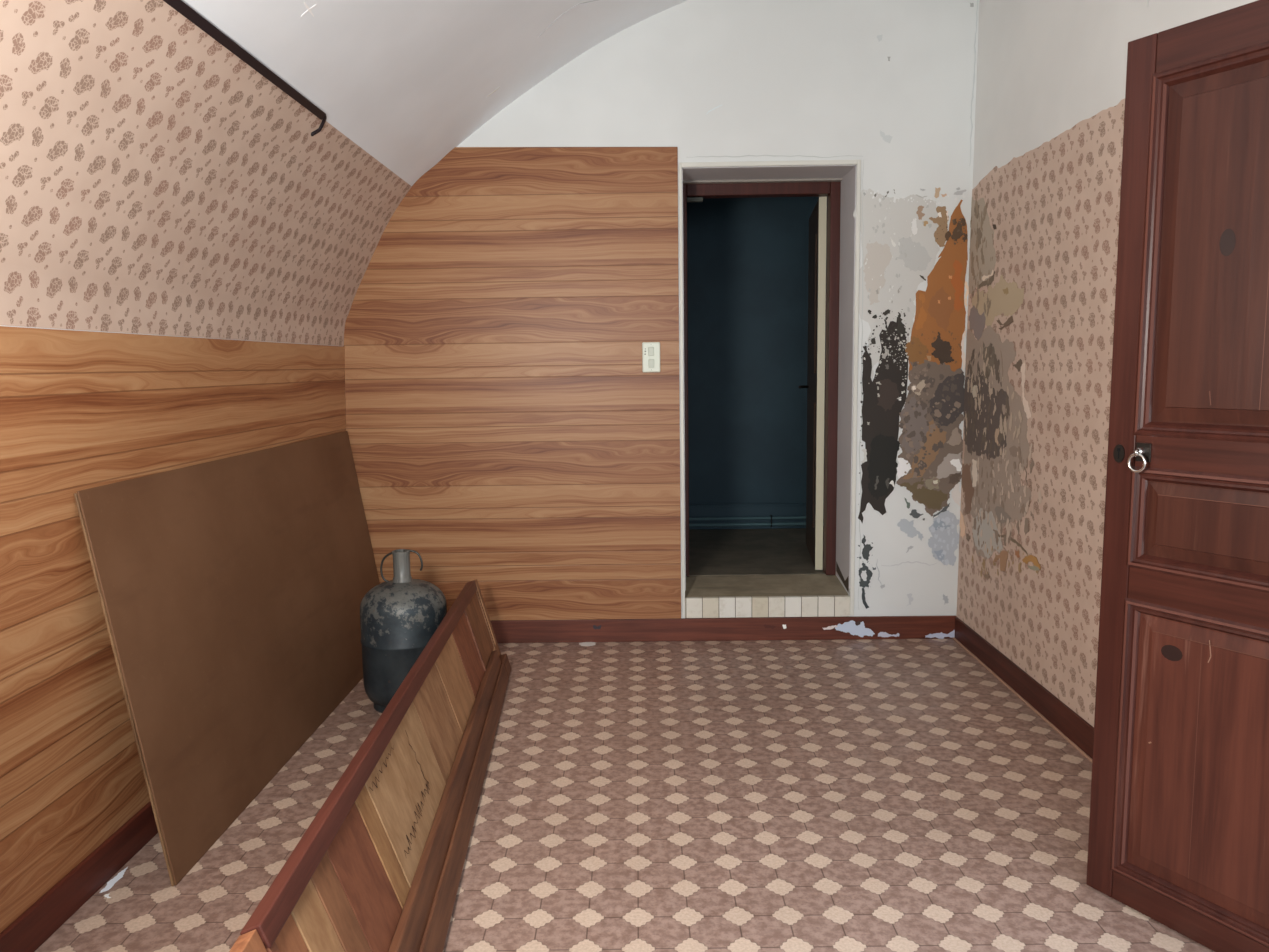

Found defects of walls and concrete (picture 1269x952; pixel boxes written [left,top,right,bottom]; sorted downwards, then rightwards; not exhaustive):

flaking render [853,187,969,401]
water stain [857,197,1042,609]
flaking render [874,458,911,490]
flaking render [904,428,962,520]
flaking render [836,561,867,591]
peeling [823,620,900,637]
peeling [925,630,955,639]